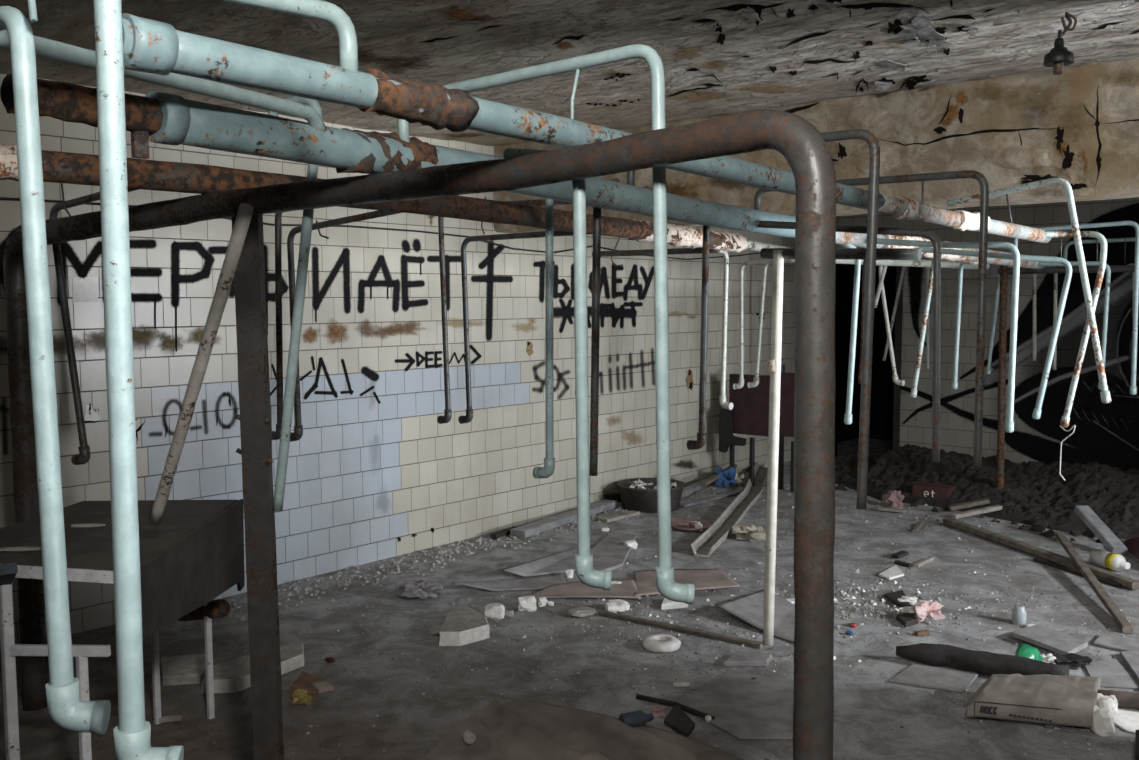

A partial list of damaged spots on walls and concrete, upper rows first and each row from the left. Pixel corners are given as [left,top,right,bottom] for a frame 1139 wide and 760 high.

peeling [665,1,795,45]
peeling [808,0,996,55]
peeling [853,60,937,93]
crack [877,89,1139,185]
corrosion [303,324,346,342]
corrosion [360,321,416,338]